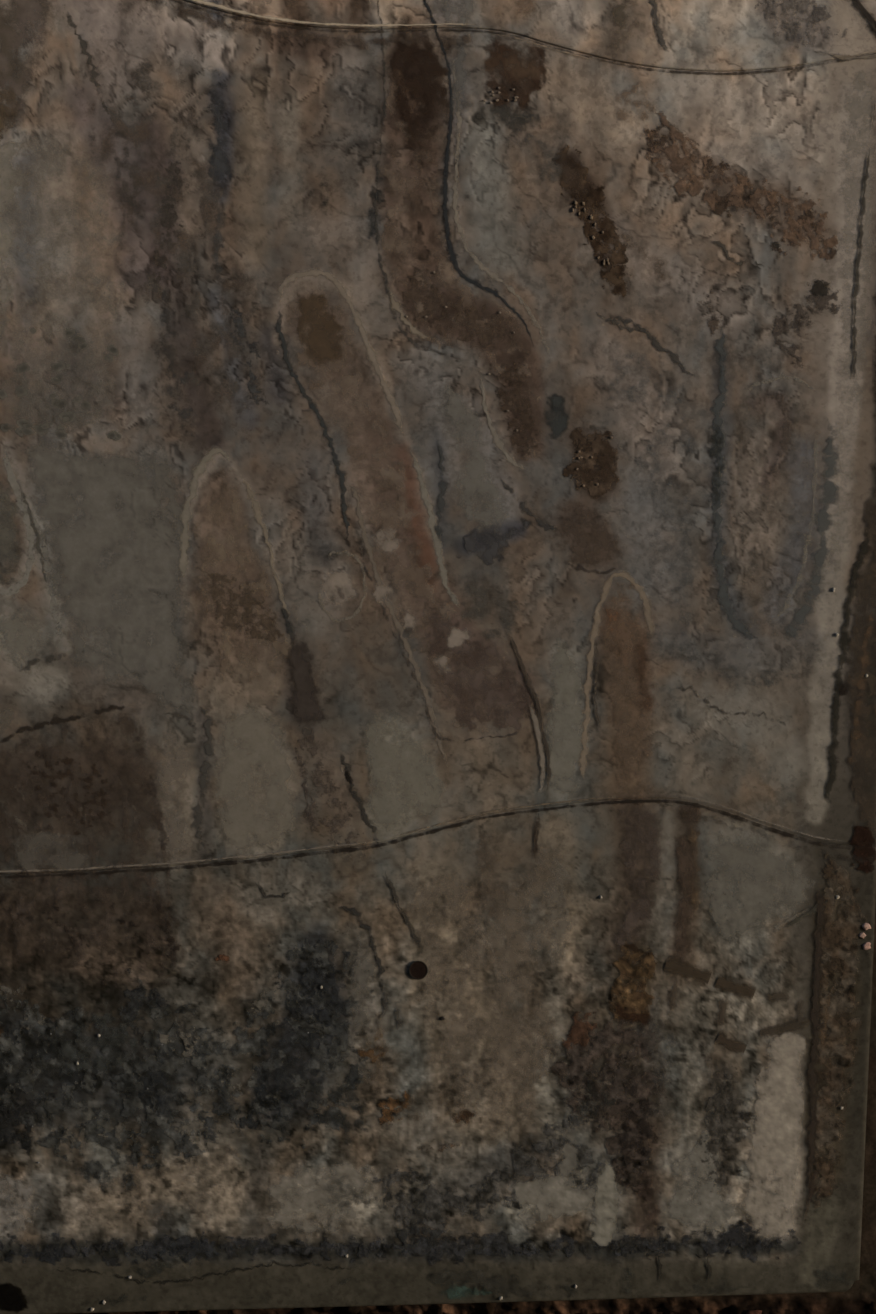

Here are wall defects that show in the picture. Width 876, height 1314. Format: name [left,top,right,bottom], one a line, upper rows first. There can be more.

crack [156,0,876,75]
rust [645,107,838,261]
crack [852,105,875,377]
crack [0,636,872,953]
rust [850,826,876,873]
crack [379,989,403,1028]
damp [0,841,806,1267]
rust [608,944,657,1024]